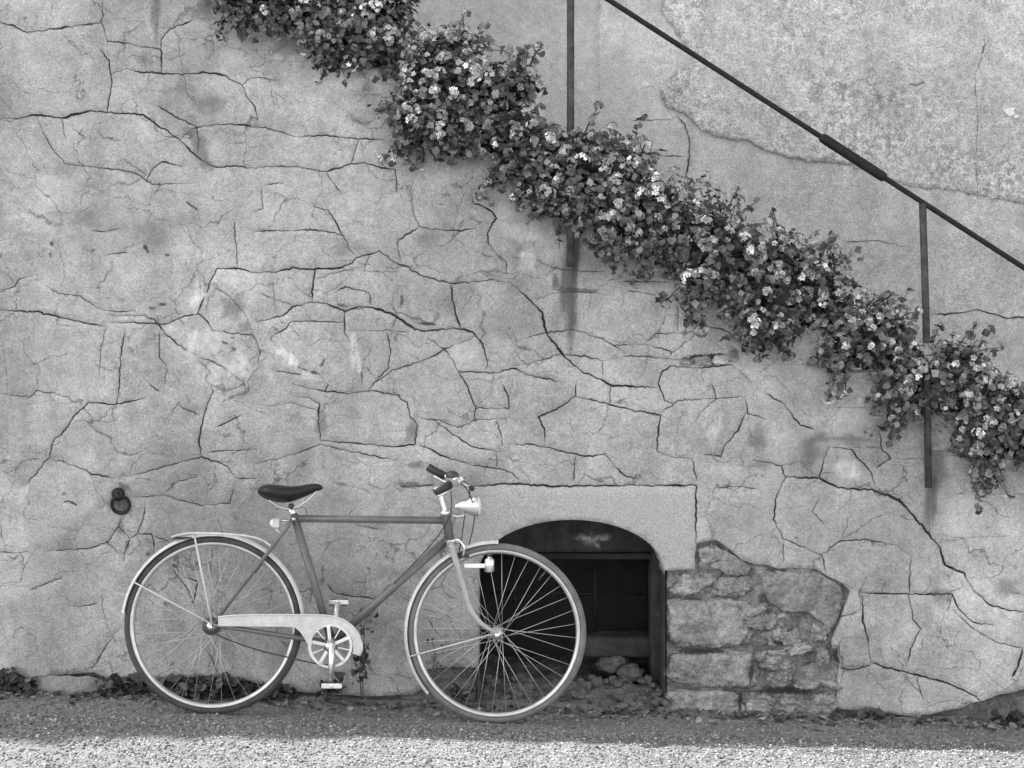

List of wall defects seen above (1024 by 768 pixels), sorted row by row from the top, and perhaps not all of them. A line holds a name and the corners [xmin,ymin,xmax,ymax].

crack [0,10,814,562]
crack [936,309,1024,319]
crack [171,566,198,603]
crack [328,580,374,599]
crack [726,436,1023,702]